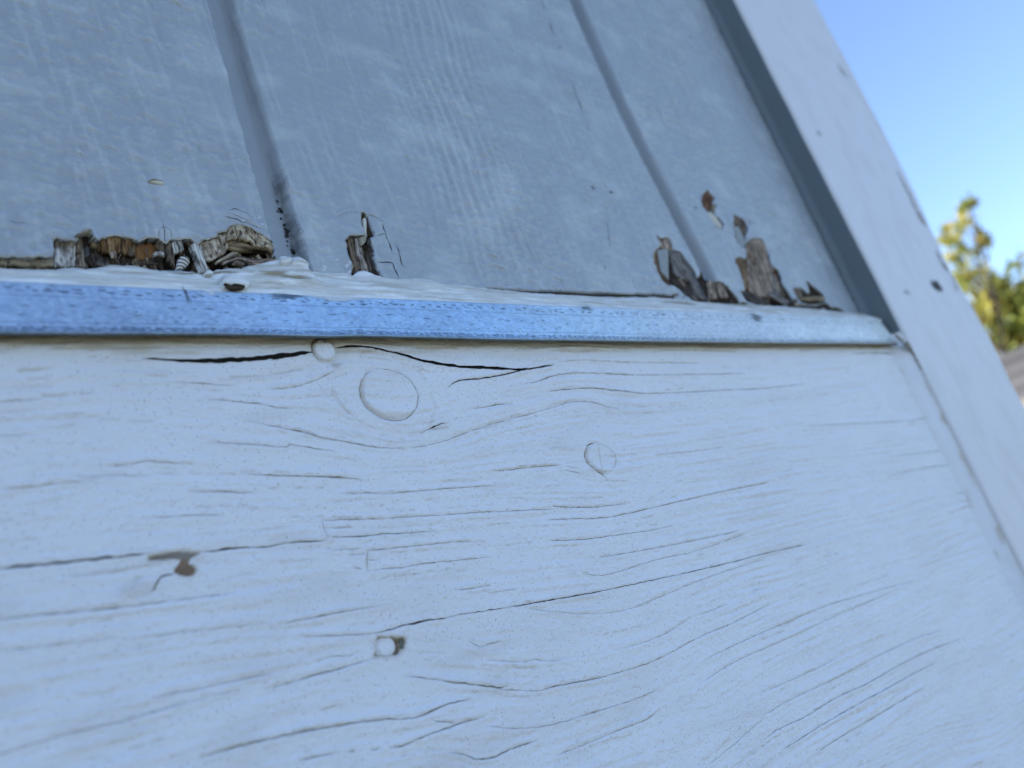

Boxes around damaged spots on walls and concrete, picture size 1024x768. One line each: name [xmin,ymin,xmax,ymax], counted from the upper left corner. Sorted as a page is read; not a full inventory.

peeling [701,189,758,248]
peeling [657,249,669,280]
crack [142,345,802,451]
peeling [150,552,198,592]
crack [0,473,914,760]